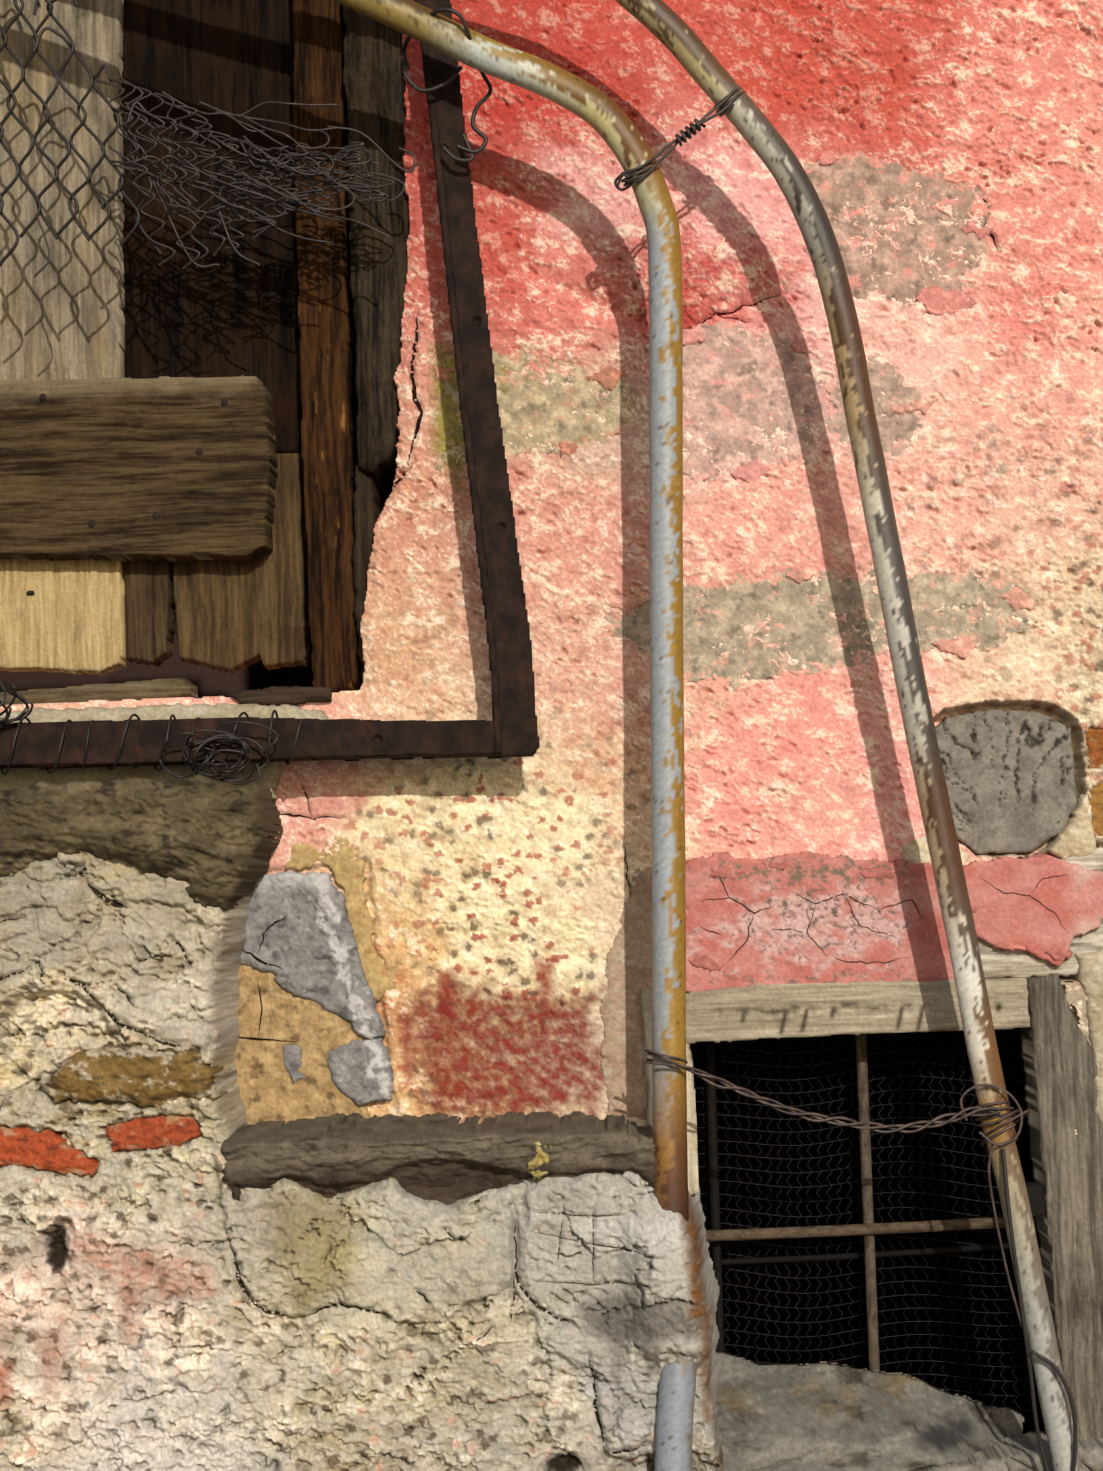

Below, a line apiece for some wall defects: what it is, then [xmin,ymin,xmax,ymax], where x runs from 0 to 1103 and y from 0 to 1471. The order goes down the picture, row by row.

crack [393,314,423,487]
crack [0,962,183,1047]
crack [79,867,127,908]
crack [144,939,191,966]
peeling [234,836,402,1125]
crack [700,878,924,964]
crack [985,874,1069,925]